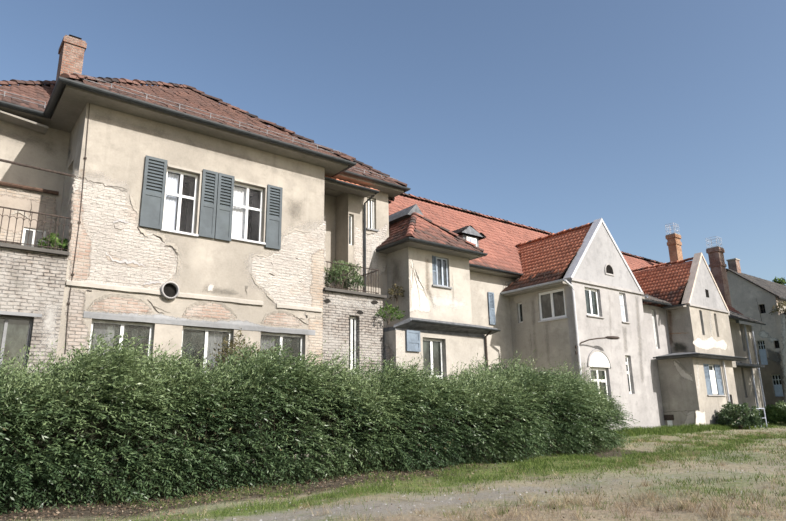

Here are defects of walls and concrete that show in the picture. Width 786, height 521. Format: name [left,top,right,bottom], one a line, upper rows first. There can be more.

flaking render [0,185,57,244]
flaking render [66,176,331,365]
flaking render [693,337,727,350]
flaking render [759,314,786,389]